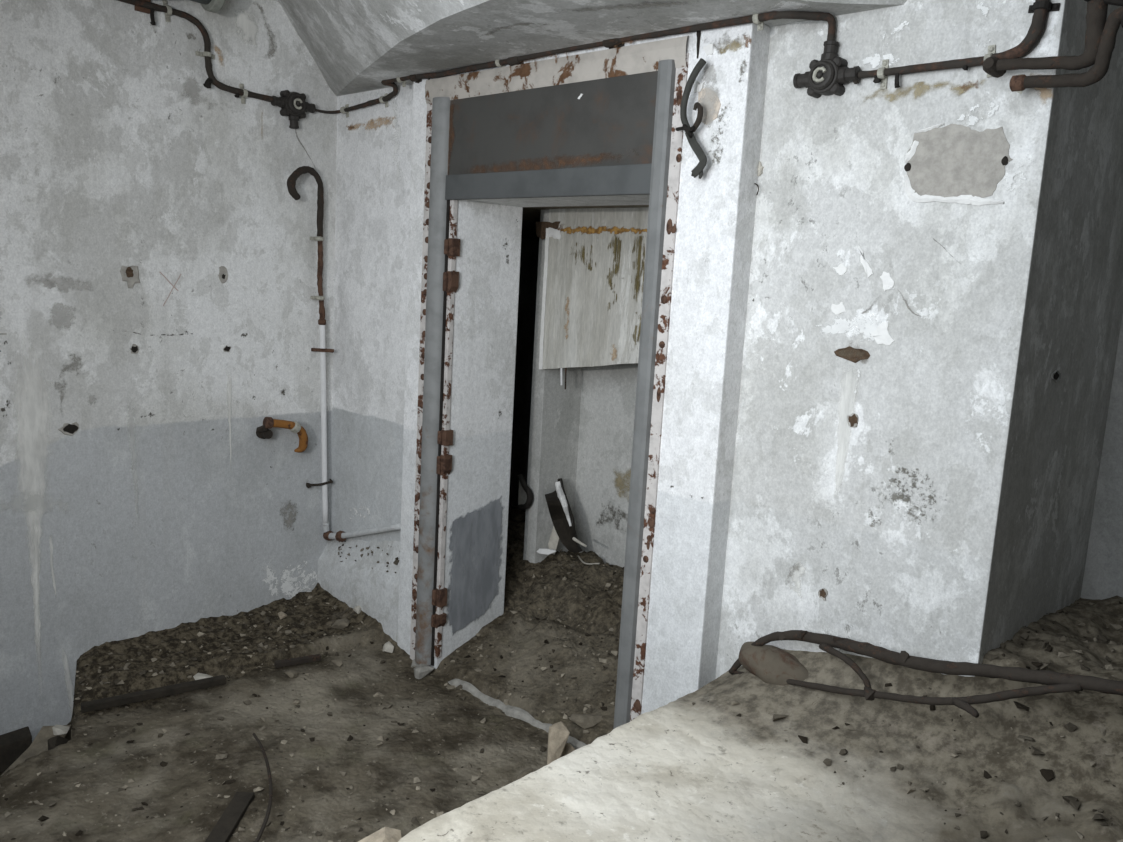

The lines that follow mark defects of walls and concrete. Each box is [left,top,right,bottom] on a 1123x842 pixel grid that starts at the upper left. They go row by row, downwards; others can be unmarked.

peeling [904,101,1031,206]
peeling [858,245,895,291]
peeling [816,302,895,363]
leakage [1,363,56,669]
leakage [885,467,935,521]
leakage [63,655,74,714]